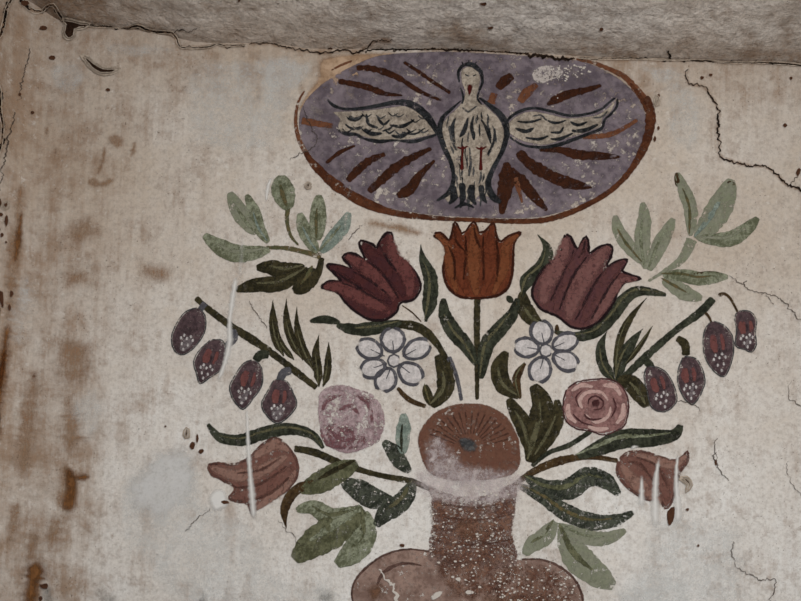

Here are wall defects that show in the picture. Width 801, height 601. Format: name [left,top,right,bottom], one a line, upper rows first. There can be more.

crack [0,0,67,38]
crack [0,48,31,183]
crack [731,276,801,320]
rust [56,467,88,510]
spalling [679,476,693,493]
spalling [667,507,675,525]
rust [25,535,48,601]
crack [731,542,777,601]